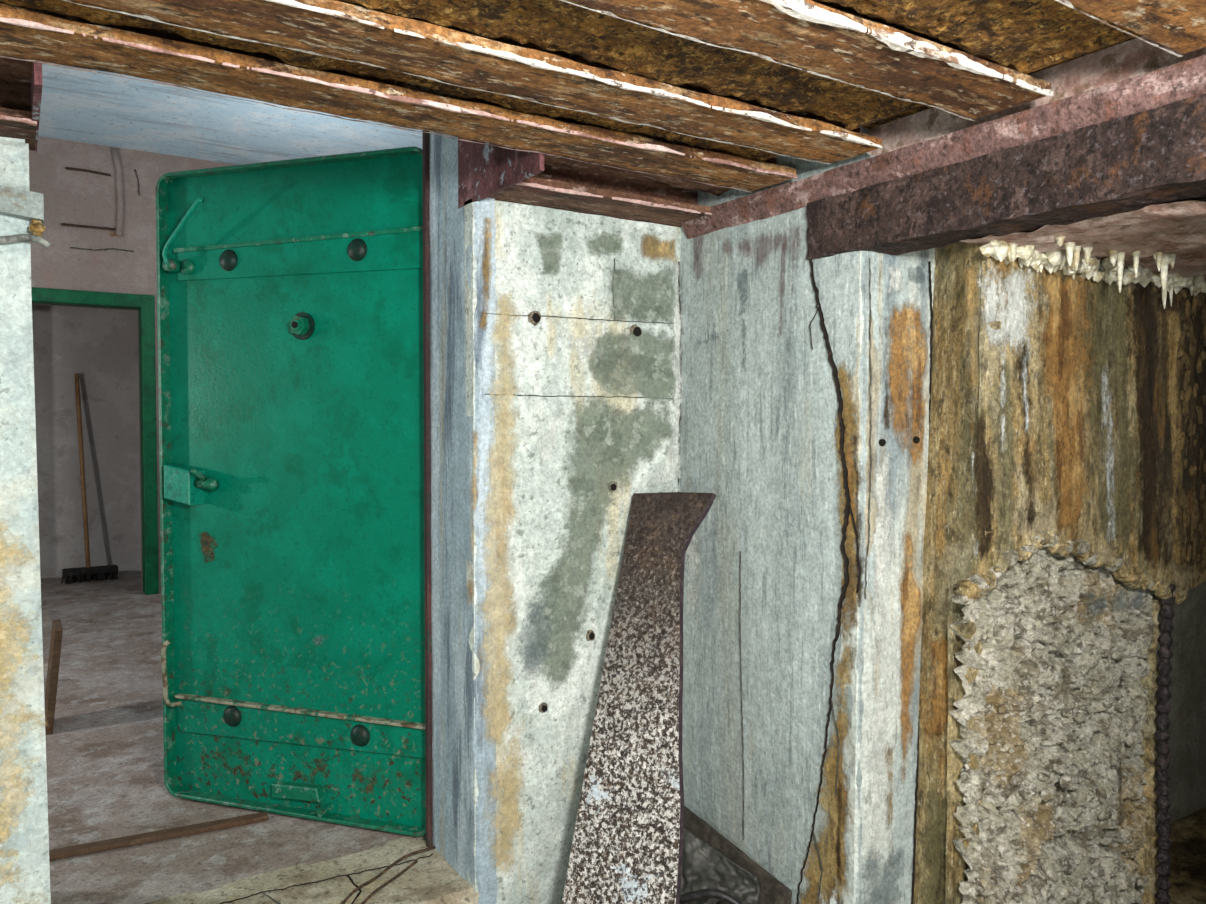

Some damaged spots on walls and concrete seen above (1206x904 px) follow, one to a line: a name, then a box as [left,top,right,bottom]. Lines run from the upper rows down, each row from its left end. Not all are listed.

water stain [0,522,43,885]
crack [220,853,433,904]
water stain [467,218,683,865]
rust [799,362,865,904]
crack [797,258,872,904]
rust [884,304,928,464]
rust [886,536,957,824]
spalling [949,531,1188,904]
water stain [979,240,1206,574]